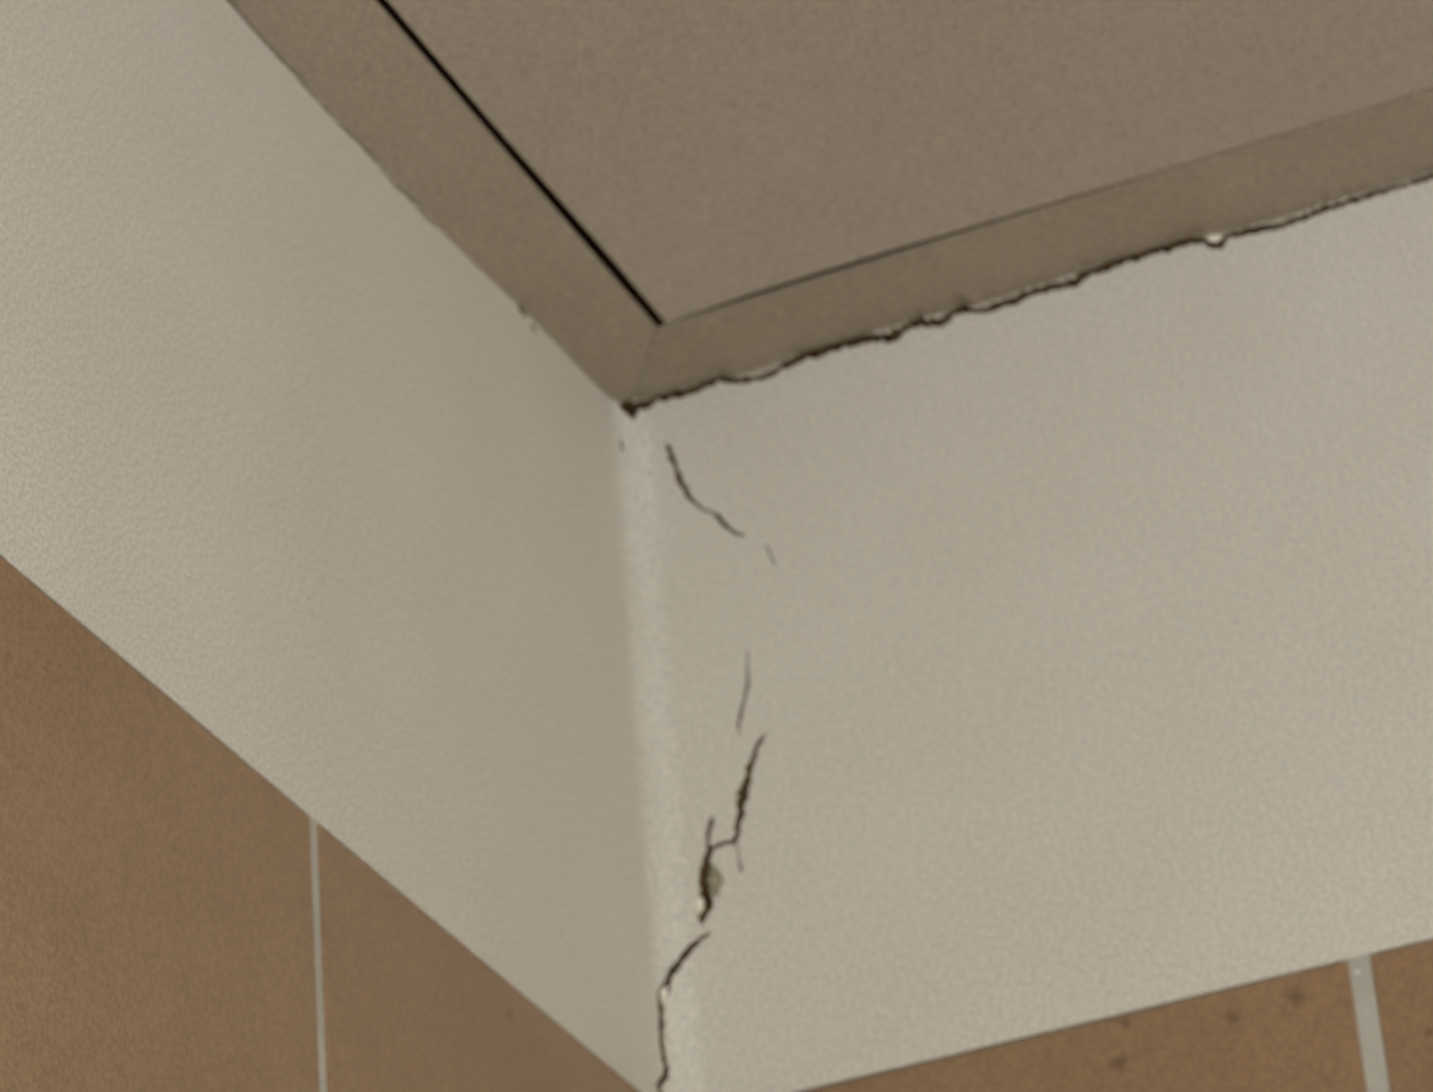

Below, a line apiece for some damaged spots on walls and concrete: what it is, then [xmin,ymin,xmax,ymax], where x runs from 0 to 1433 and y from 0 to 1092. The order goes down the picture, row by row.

crack [619,173,1433,452]
crack [666,442,776,567]
crack [656,650,767,1092]